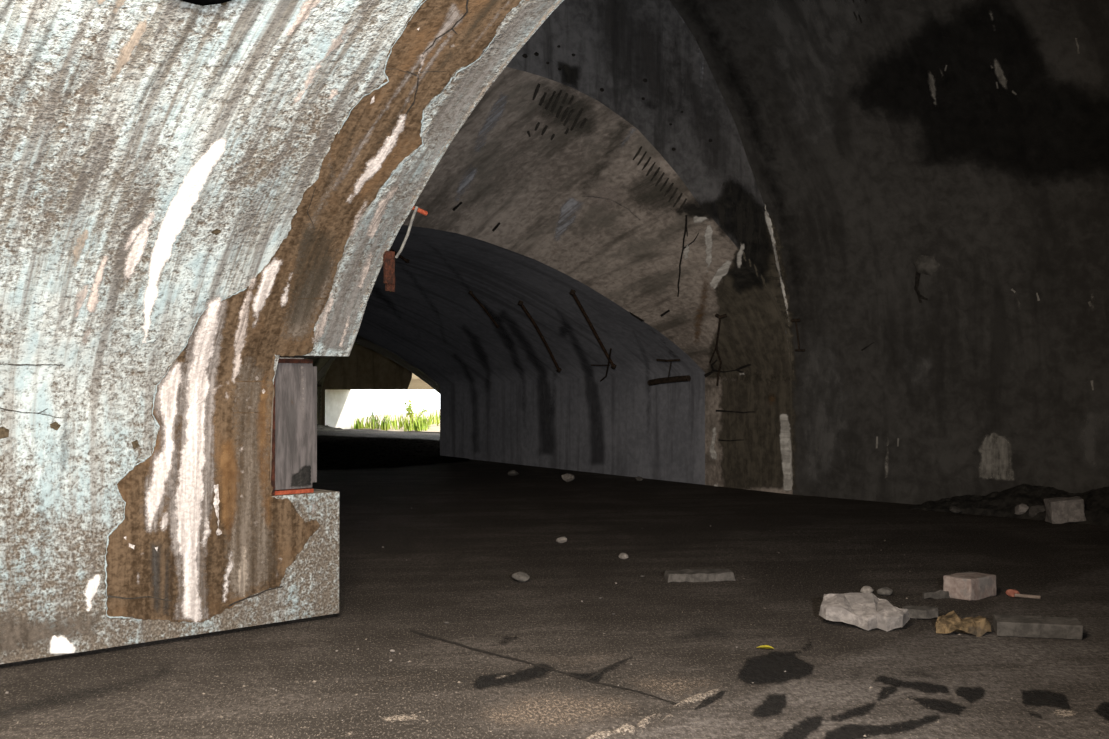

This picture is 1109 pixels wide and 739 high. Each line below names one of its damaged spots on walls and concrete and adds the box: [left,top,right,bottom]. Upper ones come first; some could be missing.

leakage [295,29,347,102]
crack [383,0,469,117]
leakage [991,60,1016,95]
leakage [75,256,107,317]
leakage [125,139,226,343]
peeling [0,0,521,651]
leakage [630,174,796,491]